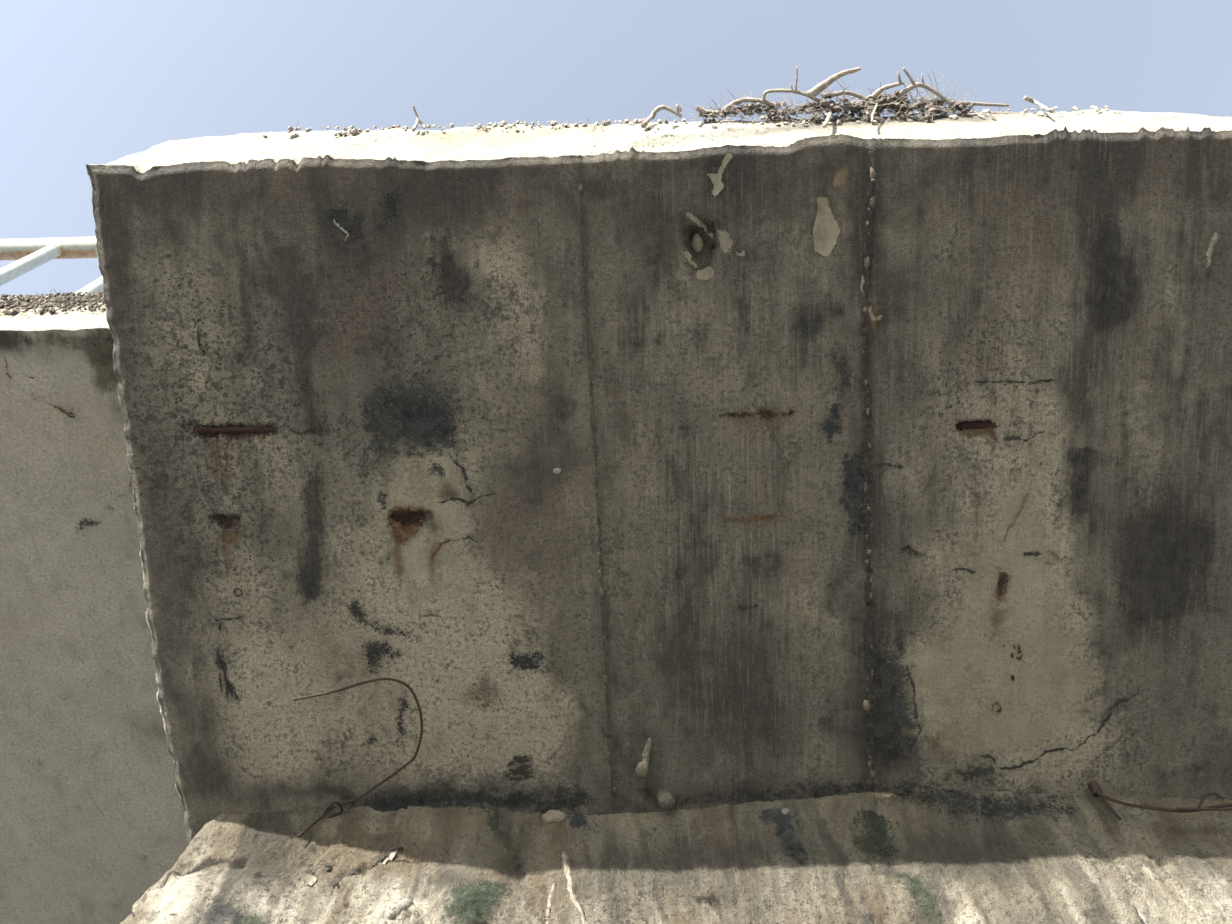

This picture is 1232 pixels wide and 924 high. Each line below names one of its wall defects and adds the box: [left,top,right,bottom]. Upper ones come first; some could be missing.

leakage [297,463,325,605]
leakage [1115,486,1213,633]
spalling [161,856,261,888]
peeling [302,863,331,885]